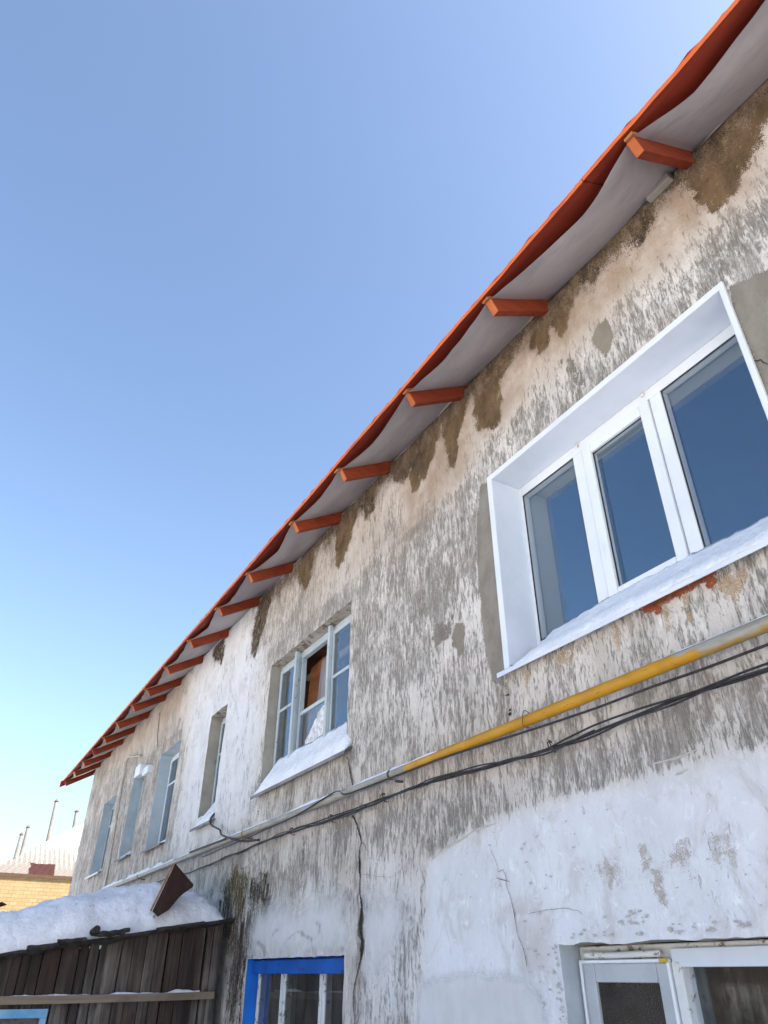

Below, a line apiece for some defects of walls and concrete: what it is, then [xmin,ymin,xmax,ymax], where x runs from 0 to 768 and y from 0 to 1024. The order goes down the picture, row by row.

water stain [250,78,768,660]
flaking render [639,571,717,615]
water stain [219,871,317,1024]
crack [352,815,391,1024]